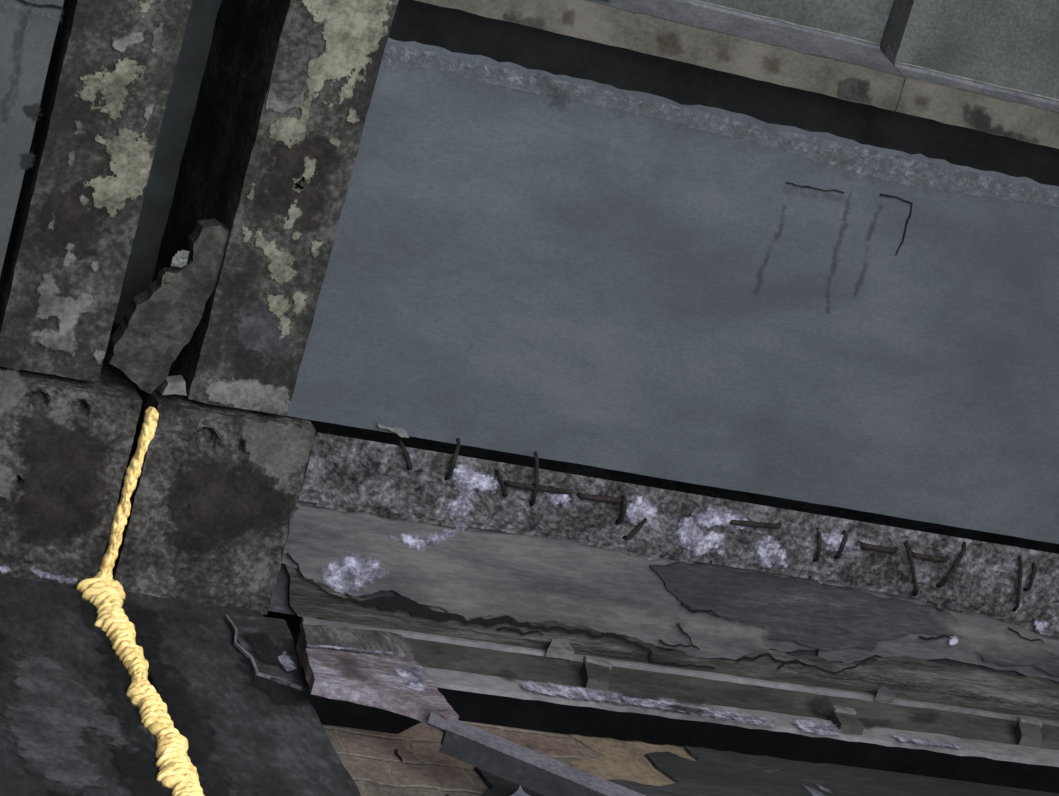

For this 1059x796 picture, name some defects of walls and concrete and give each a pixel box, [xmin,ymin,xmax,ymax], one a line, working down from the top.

peeling [139,0,154,18]
peeling [70,23,163,217]
peeling [63,243,76,267]
peeling [30,273,95,365]
water stain [0,370,112,551]
water stain [163,378,316,560]
crack [286,553,877,674]
spalling [285,422,1059,740]
crack [919,600,952,641]
crack [1008,627,1045,644]
peeling [475,767,545,796]
peeling [608,745,1059,796]